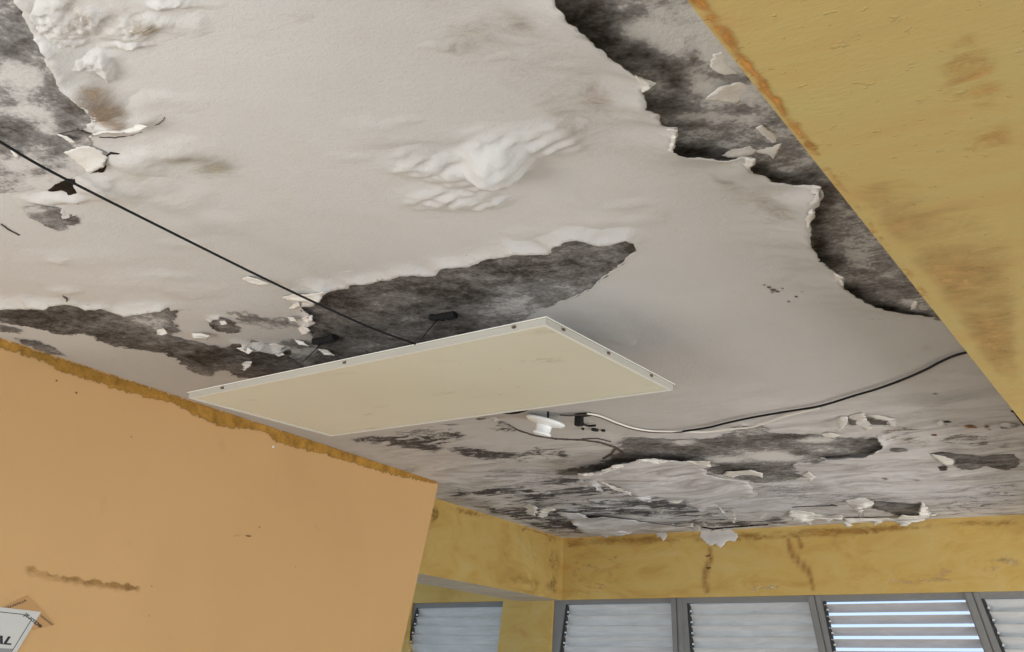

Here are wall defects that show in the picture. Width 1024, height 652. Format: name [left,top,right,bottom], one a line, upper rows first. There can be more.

peeling [22,205,85,231]
peeling [0,0,147,193]
peeling [424,0,945,325]
peeling [523,413,908,548]
peeling [788,498,936,527]
peeling [930,452,1019,471]